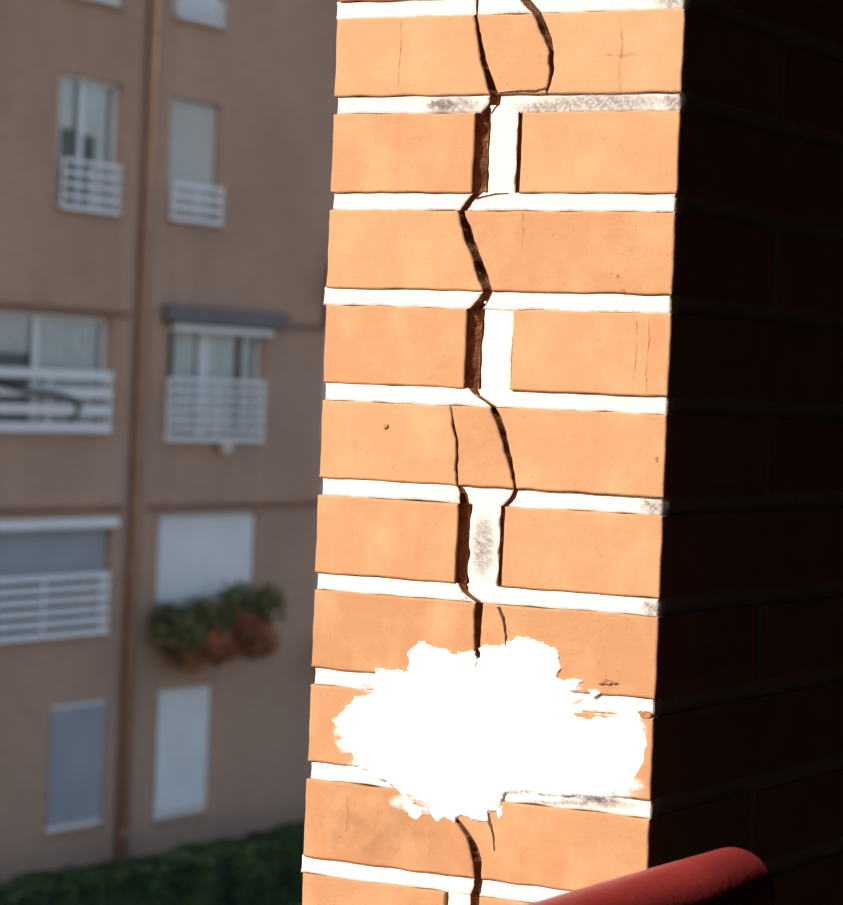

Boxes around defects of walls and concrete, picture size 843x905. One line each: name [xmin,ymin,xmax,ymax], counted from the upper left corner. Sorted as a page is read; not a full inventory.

crack [450,0,554,658]
crack [456,809,495,905]